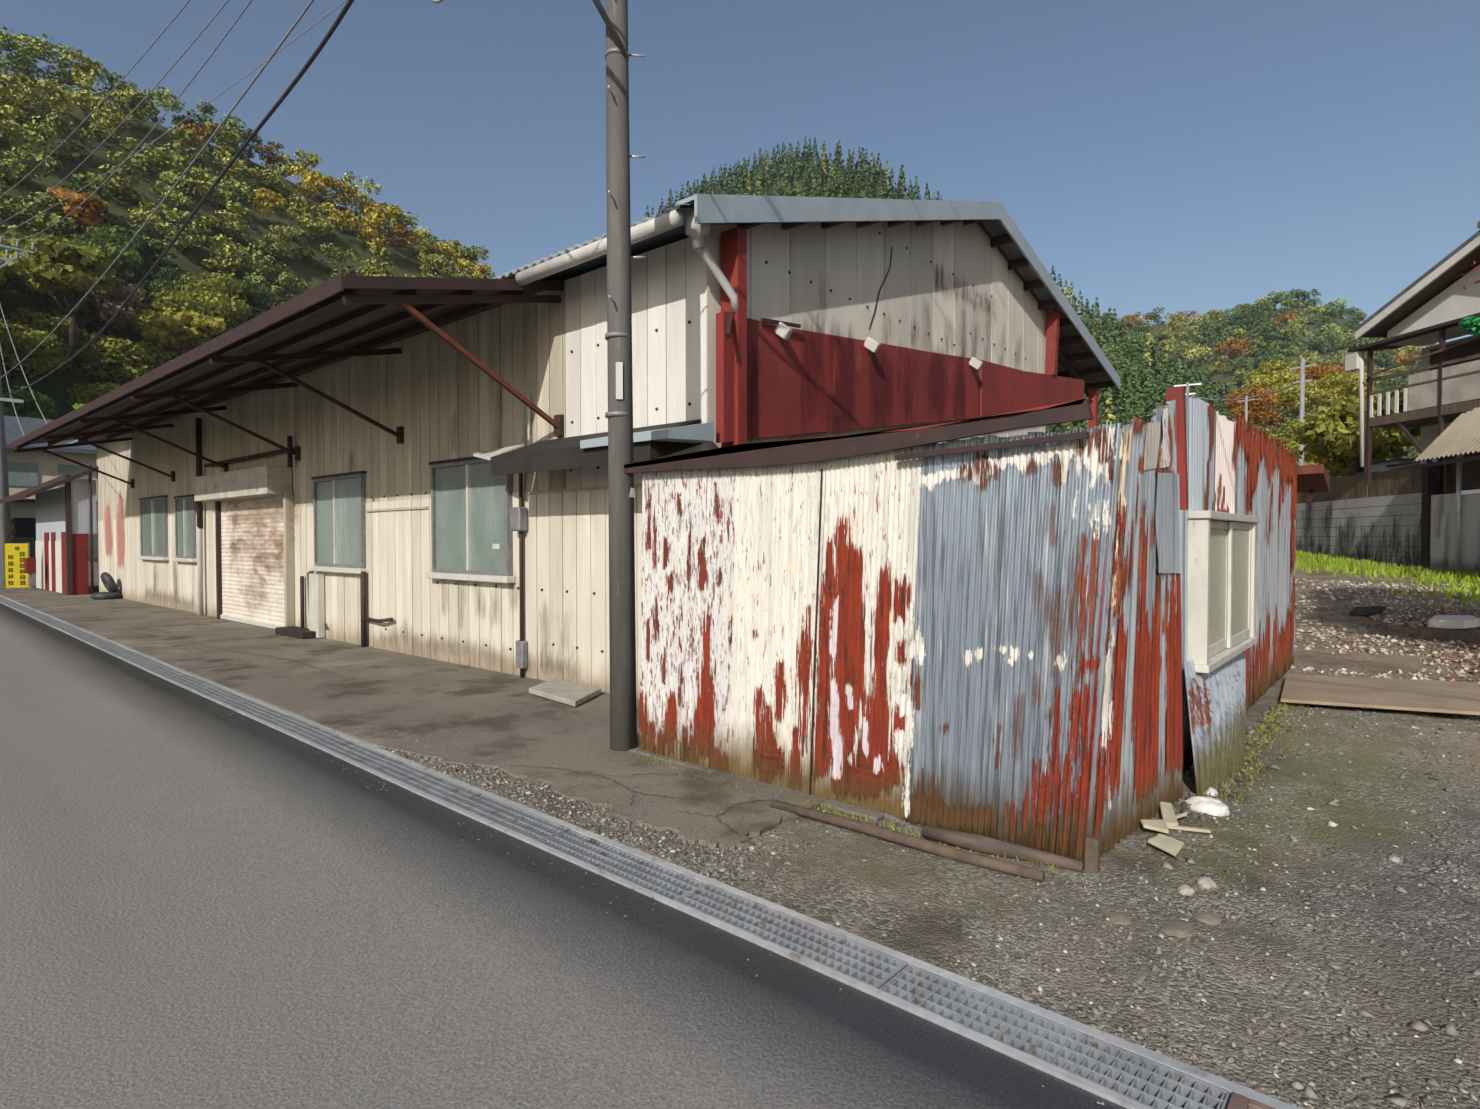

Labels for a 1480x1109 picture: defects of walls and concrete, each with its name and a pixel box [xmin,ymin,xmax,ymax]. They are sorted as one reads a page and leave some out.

rust [639,481,733,773]
rust [748,410,1214,862]
rust [1204,404,1298,714]
crack [511,765,773,833]